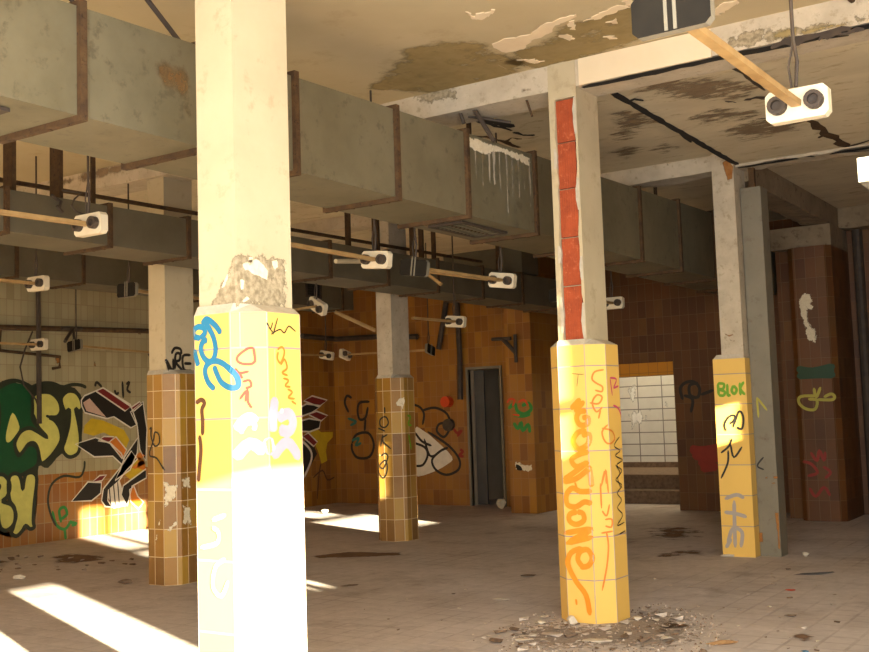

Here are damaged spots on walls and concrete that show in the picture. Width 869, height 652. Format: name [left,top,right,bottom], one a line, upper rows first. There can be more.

leakage [369,7,638,93]
peeling [492,0,633,64]
peeling [715,0,739,16]
leakage [610,111,655,156]
leakage [639,78,799,138]
crack [582,24,869,168]
leakage [469,137,531,214]
flaking render [212,255,286,307]